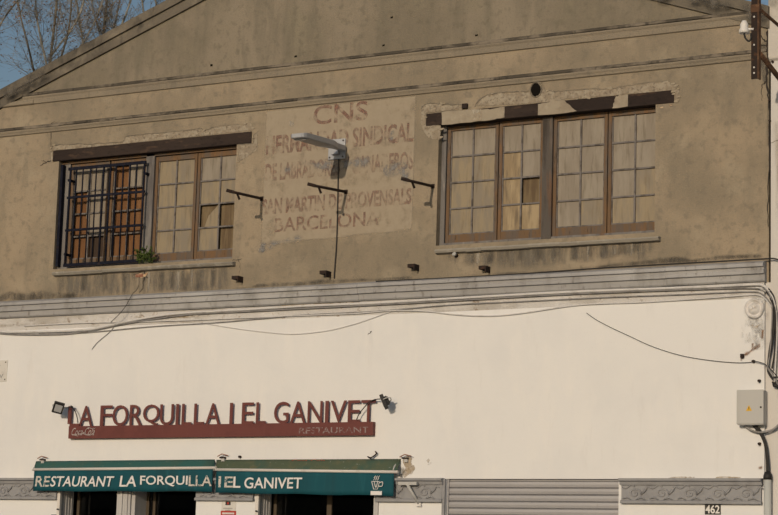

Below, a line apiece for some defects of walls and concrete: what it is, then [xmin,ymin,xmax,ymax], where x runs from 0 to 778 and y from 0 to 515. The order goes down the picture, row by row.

flaking render [475,80,680,108]
flaking render [420,102,463,140]